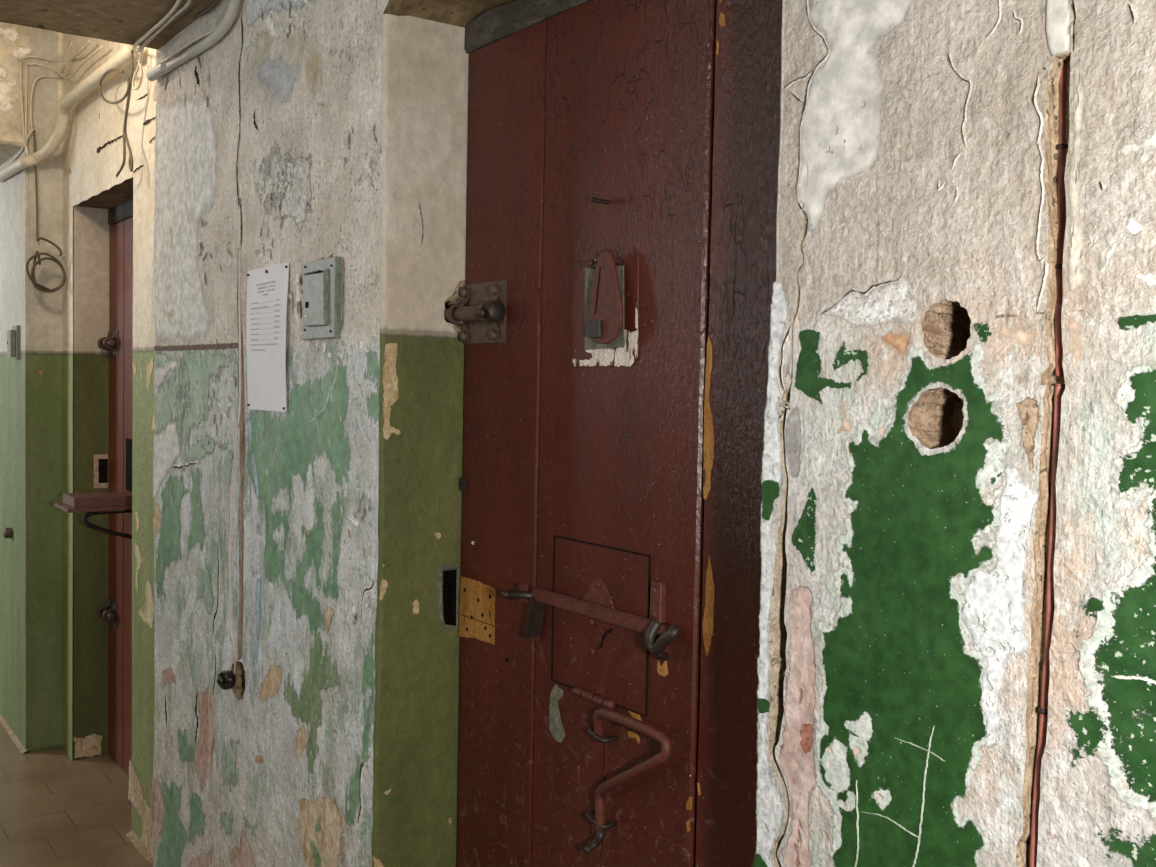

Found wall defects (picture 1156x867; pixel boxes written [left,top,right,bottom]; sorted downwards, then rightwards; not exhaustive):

crack [984,0,1023,42]
crack [936,52,972,202]
crack [1031,75,1049,312]
peeling [128,255,401,867]
peeling [761,480,780,521]
peeling [795,329,869,405]
crack [768,0,904,867]
peeling [779,352,1005,867]
peeling [971,322,992,342]
peeling [1065,369,1156,802]
peeling [1117,314,1156,331]
peeling [1096,824,1156,867]